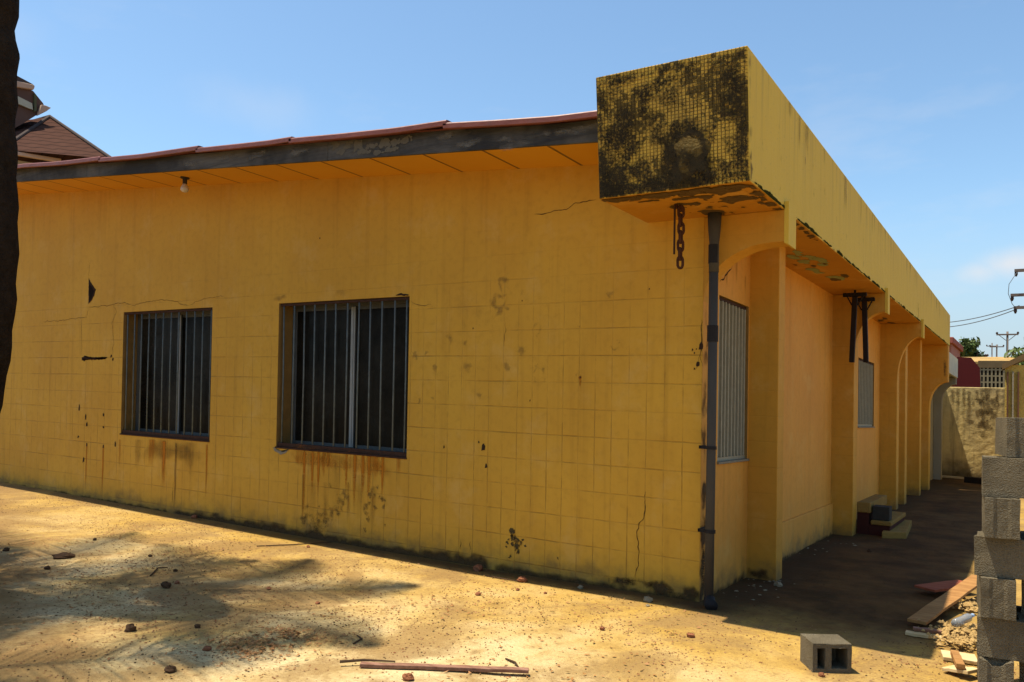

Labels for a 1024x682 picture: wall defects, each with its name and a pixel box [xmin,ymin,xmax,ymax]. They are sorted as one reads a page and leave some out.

damp [544,49,783,210]
peeling [601,185,770,215]
peeling [787,250,849,281]
damp [82,483,766,602]
crack [635,492,646,575]